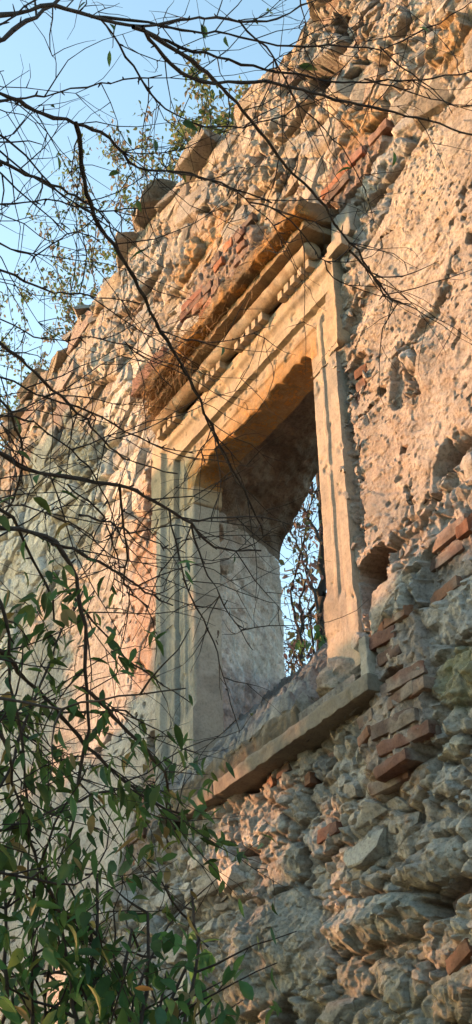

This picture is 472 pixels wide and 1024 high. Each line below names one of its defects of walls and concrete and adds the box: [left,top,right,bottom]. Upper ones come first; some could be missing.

flaking render [321,118,395,212]
flaking render [357,479,472,798]